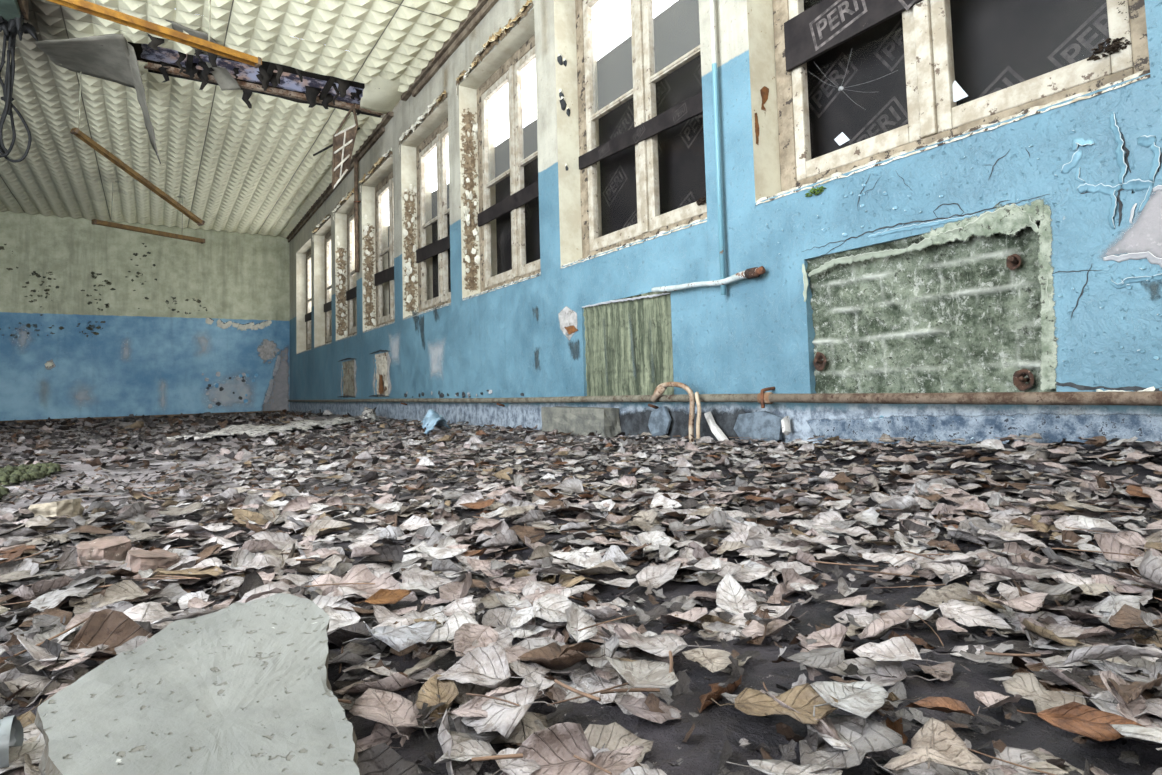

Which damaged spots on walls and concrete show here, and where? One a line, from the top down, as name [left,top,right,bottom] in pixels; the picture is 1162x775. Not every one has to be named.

peeling [312,0,532,292]
corrosion [755,86,769,145]
flaking render [201,346,290,411]
peeling [362,214,376,329]
peeling [400,184,418,312]
flaking render [558,292,674,396]
flaking render [802,192,1162,393]
crack [1052,265,1102,321]
peeling [1054,112,1162,299]